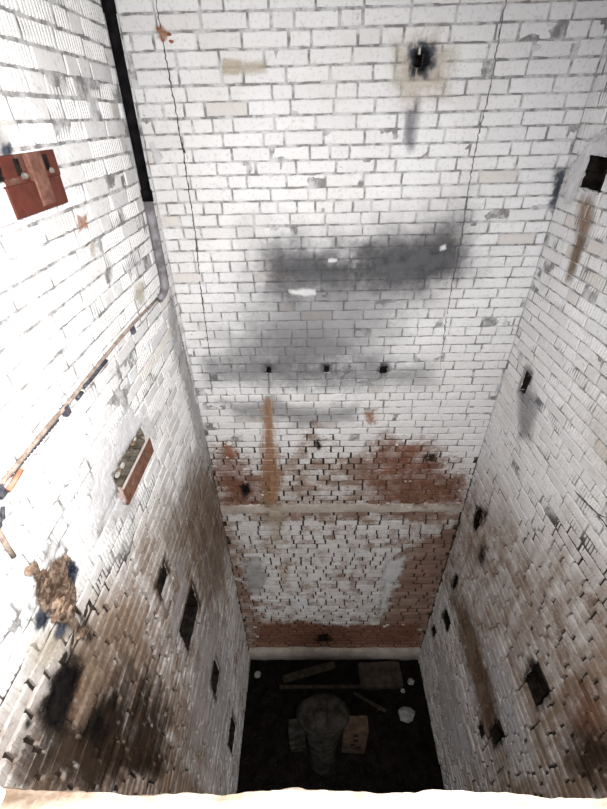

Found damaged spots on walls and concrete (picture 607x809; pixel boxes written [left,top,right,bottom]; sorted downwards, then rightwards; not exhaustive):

crack [156,0,213,367]
crack [440,0,507,368]
corrosion [567,200,592,279]
crack [170,297,192,382]
corrosion [263,401,279,508]
spalling [24,554,93,641]
water stain [19,653,170,790]